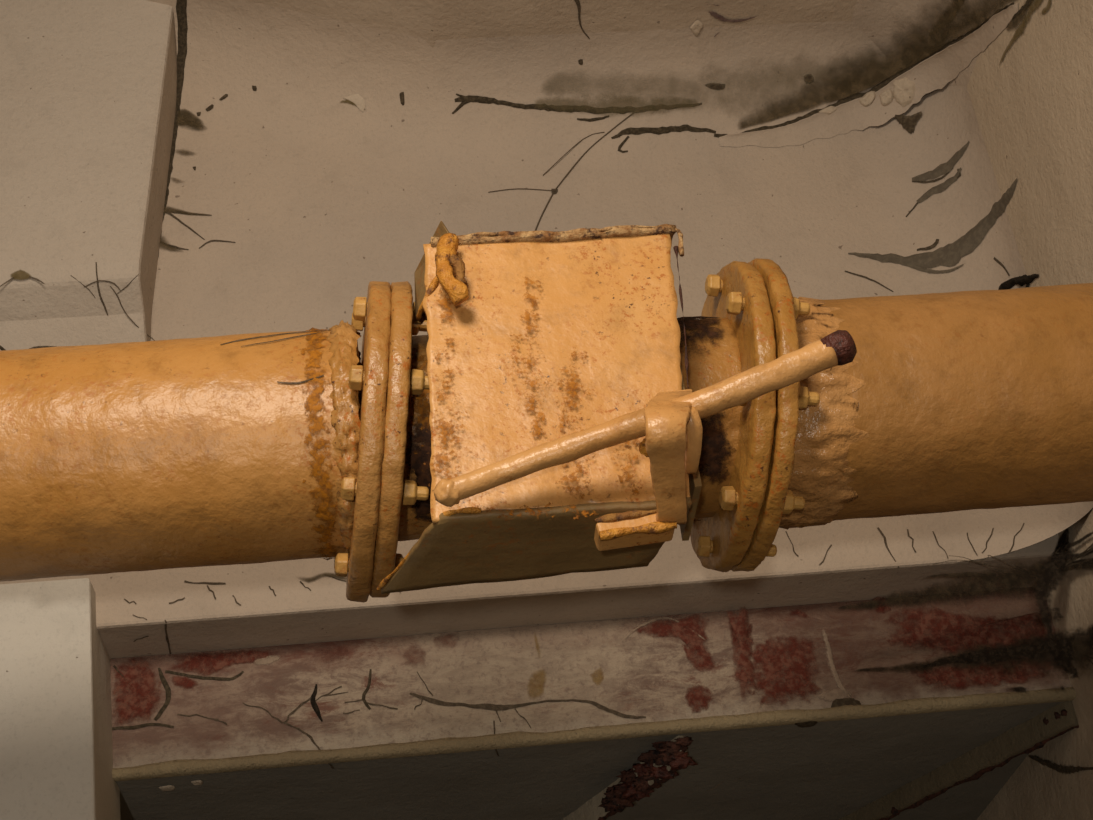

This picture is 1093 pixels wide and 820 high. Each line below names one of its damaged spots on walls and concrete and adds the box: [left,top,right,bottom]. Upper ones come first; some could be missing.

crack [574,0,590,39]
water stain [1000,0,1051,63]
crack [452,93,716,153]
crack [70,262,155,341]
crack [0,344,57,352]
crack [112,585,646,769]
rust [598,736,698,820]